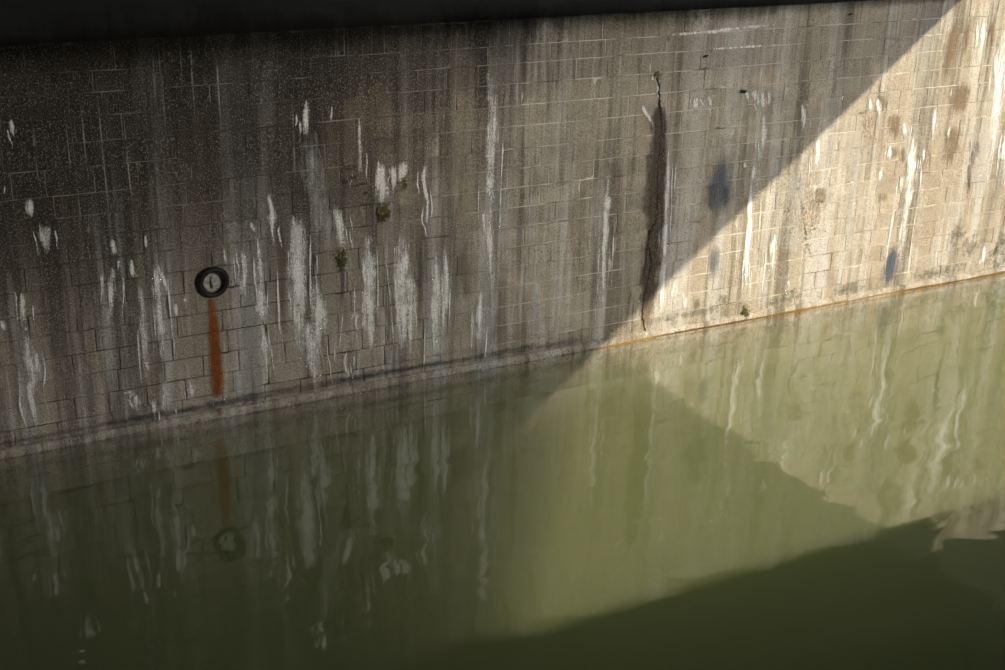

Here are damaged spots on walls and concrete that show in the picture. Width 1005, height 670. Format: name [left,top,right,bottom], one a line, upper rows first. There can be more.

damp [15,294,48,426]
damp [33,228,58,249]
corrosion [209,300,223,397]
damp [296,102,308,133]
damp [224,196,451,382]
damp [358,123,433,236]
damp [471,96,505,356]
damp [592,76,1005,350]
damp [942,22,1005,188]